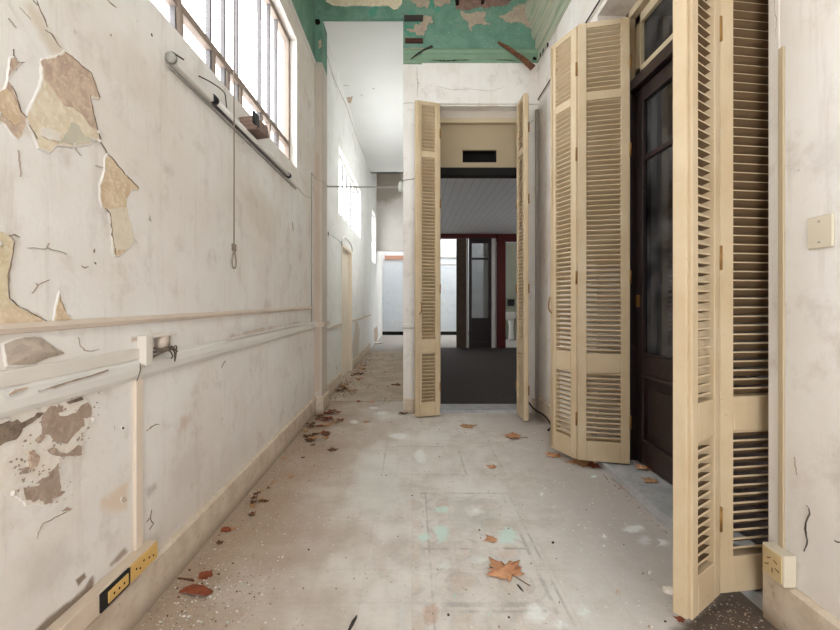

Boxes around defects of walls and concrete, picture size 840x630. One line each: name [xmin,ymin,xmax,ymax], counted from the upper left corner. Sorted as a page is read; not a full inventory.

peeling [325,0,531,37]
peeling [0,49,103,154]
peeling [98,153,139,258]
peeling [0,229,73,324]
peeling [0,392,99,512]
crack [803,505,811,552]